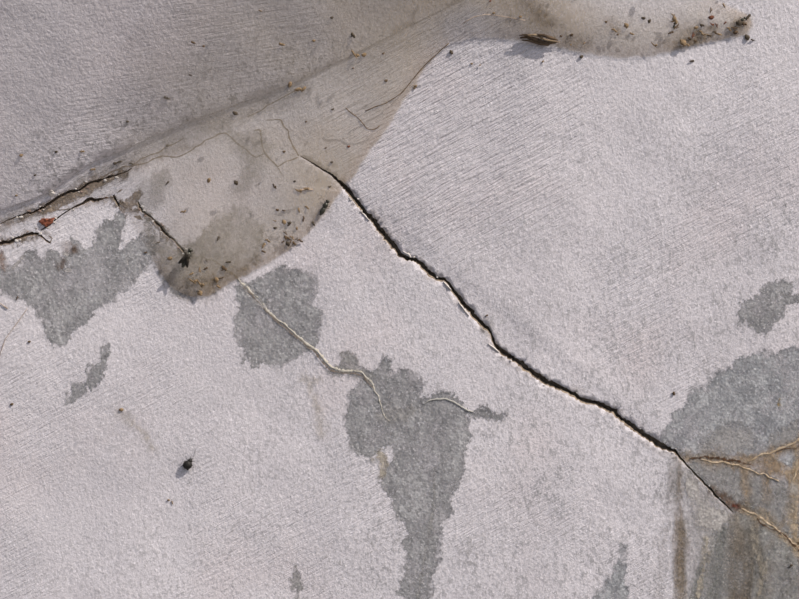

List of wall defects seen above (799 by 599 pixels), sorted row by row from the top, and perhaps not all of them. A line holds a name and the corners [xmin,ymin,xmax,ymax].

crack [0,91,733,513]
damp [661,345,799,599]